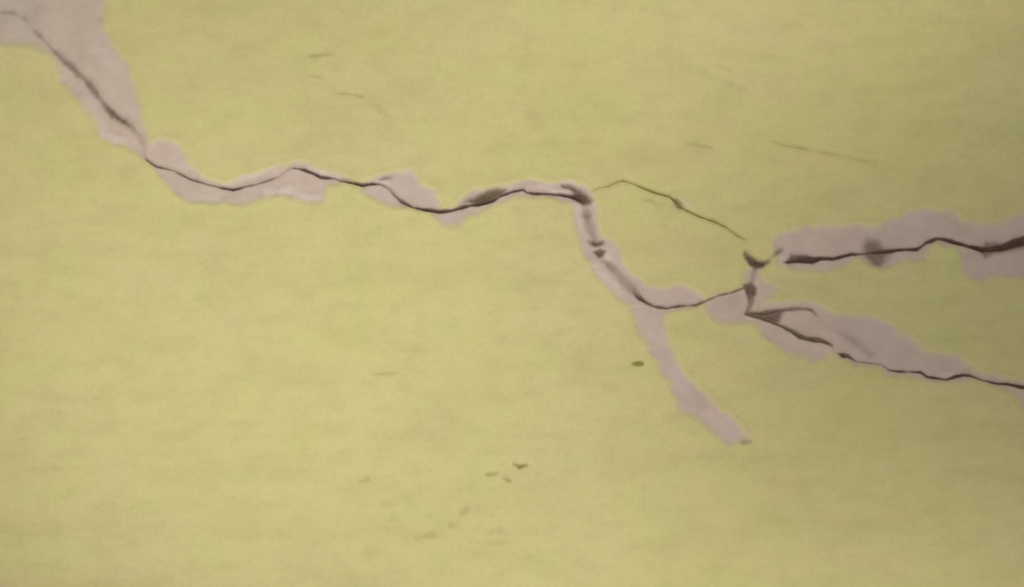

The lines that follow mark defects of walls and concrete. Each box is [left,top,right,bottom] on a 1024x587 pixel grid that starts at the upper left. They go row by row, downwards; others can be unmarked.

crack [0,8,1024,391]
peeling [0,0,1024,452]